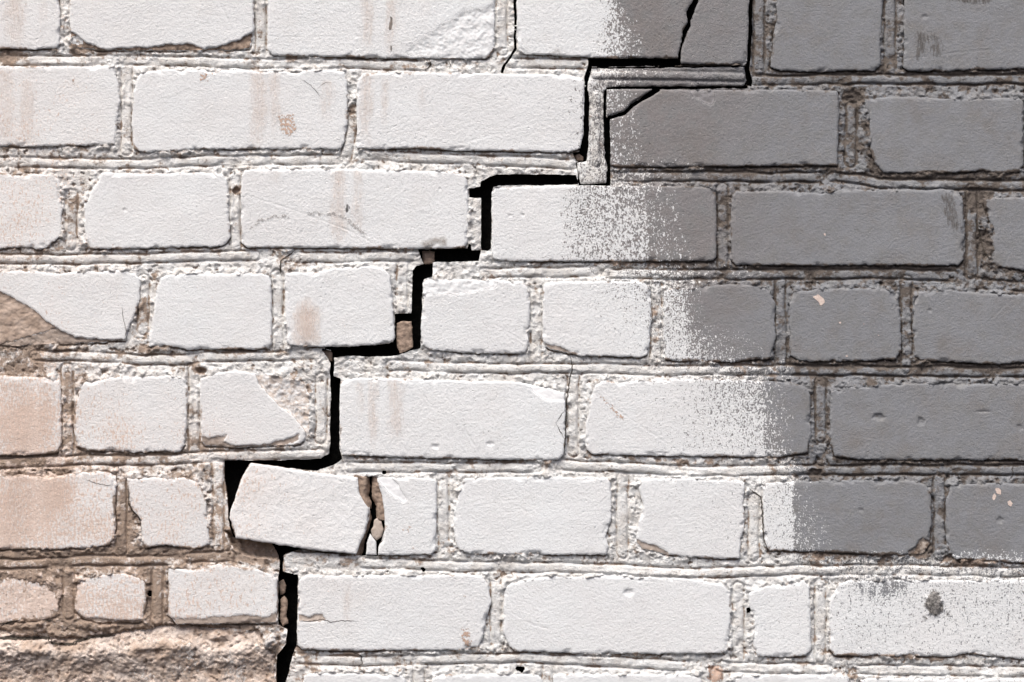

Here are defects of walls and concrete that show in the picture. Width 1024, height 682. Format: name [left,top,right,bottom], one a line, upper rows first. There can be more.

crack [225,0,752,537]
spalling [0,292,123,346]
spalling [202,374,310,447]
crack [362,476,385,556]
spalling [0,612,276,682]
crack [272,543,353,682]